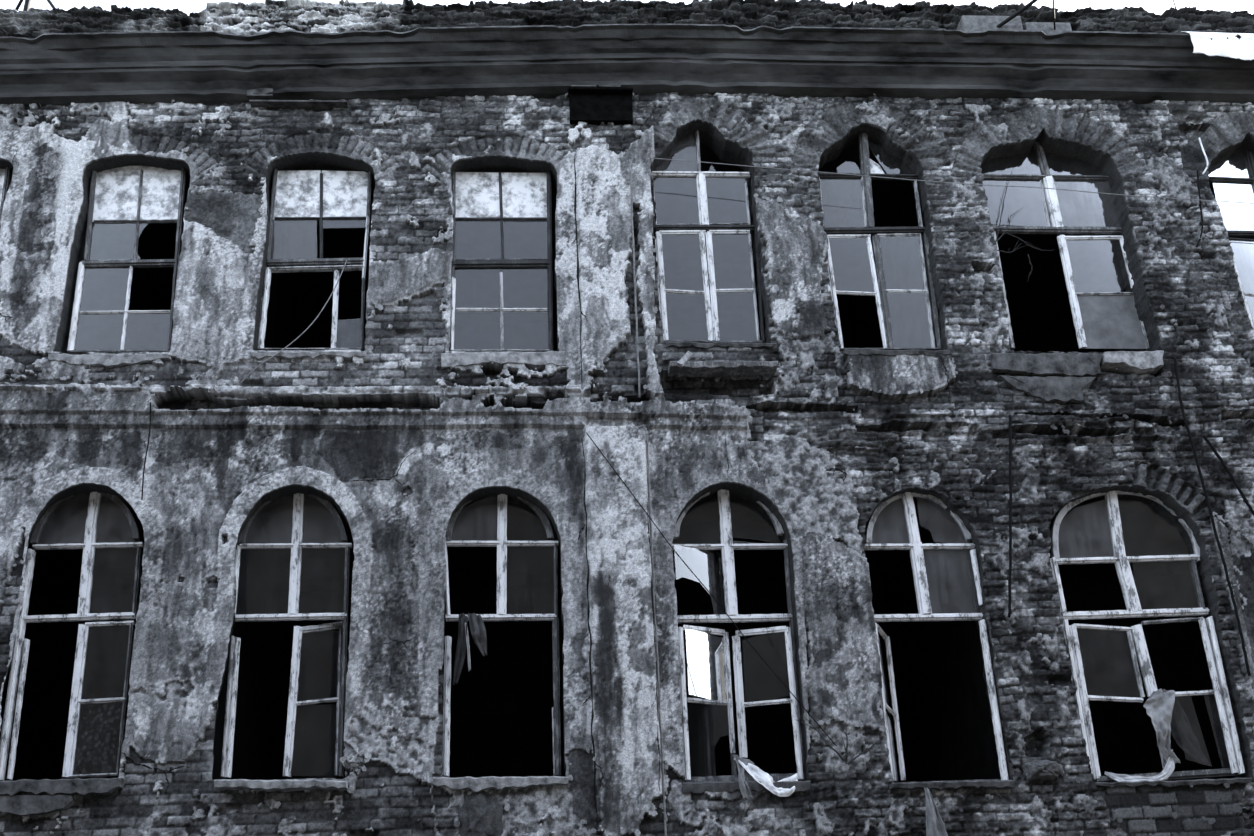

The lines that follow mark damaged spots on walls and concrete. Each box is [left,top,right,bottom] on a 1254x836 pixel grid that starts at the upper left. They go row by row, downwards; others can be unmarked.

flaking render [126,92,821,262]
flaking render [0,282,571,410]
flaking render [586,202,655,403]
spalling [651,93,1254,836]
flaking render [0,527,26,702]
spalling [206,575,220,588]
flaking render [0,669,470,836]
flaking render [487,747,612,836]
damp [595,575,621,817]
flaking render [623,761,753,836]